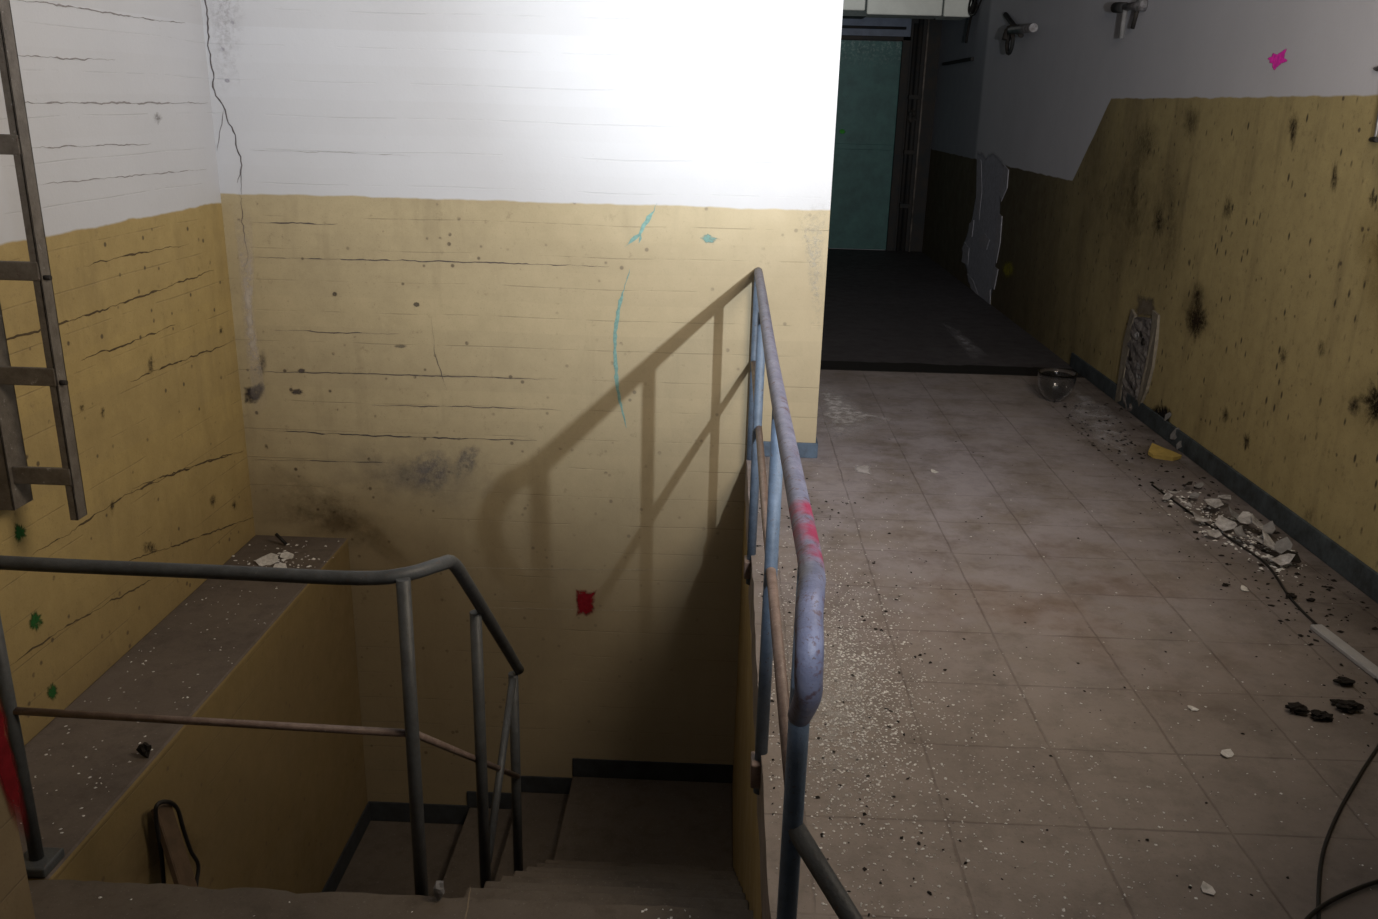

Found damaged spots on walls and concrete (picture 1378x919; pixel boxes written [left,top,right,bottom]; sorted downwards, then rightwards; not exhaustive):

crack [7,0,601,340]
peeling [962,153,1009,304]
crack [36,319,553,552]
spalling [1115,297,1182,449]
water stain [1350,388,1378,419]